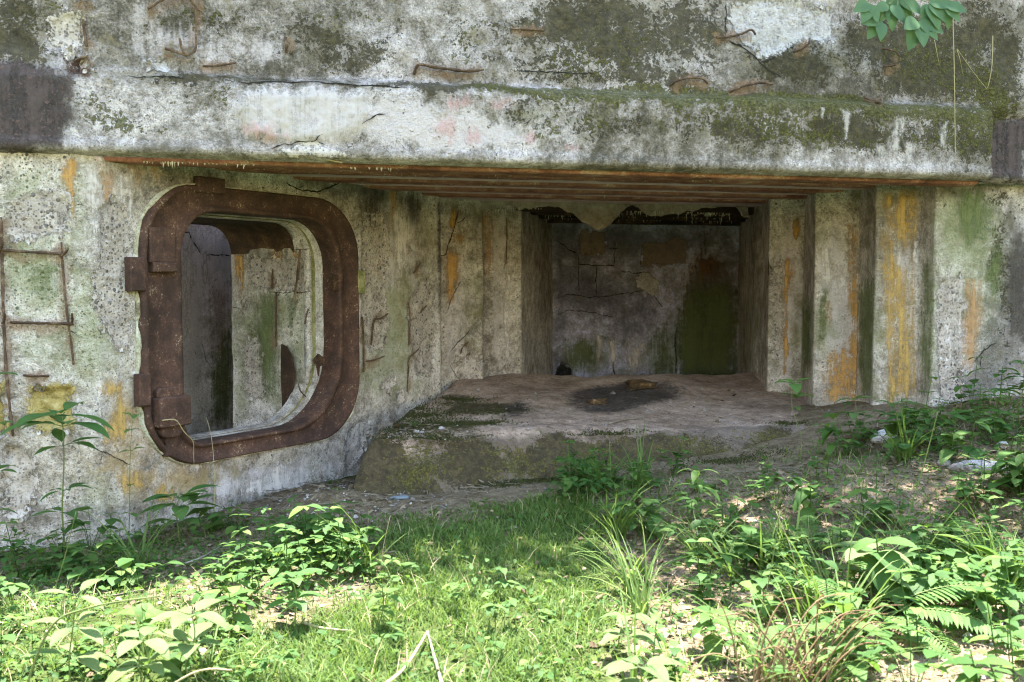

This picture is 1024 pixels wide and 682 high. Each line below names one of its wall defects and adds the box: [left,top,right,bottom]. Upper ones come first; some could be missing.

crack [131,73,184,81]
crack [242,80,404,88]
flaking render [481,201,749,231]
crack [556,240,663,317]
corrosion [882,190,917,401]
damp [959,188,1024,342]
damp [564,285,737,414]